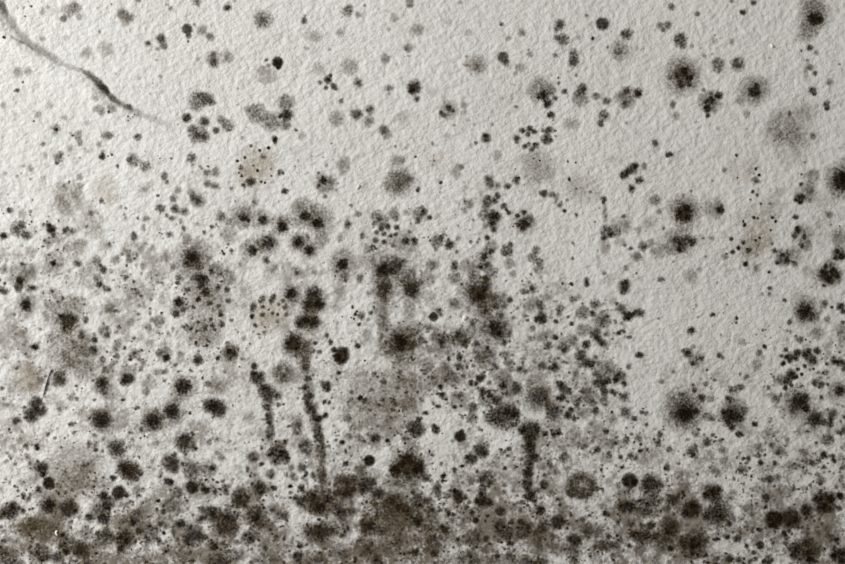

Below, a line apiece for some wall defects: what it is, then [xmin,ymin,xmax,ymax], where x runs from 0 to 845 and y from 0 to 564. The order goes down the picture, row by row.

water stain [555,20,579,66]
water stain [591,18,608,40]
water stain [265,57,283,70]
crack [96,78,109,93]
water stain [183,93,232,142]
water stain [251,96,298,131]
water stain [408,81,421,102]
water stain [531,77,610,127]
water stain [670,66,722,117]
water stain [514,126,557,161]
water stain [620,163,644,191]
water stain [0,166,845,564]